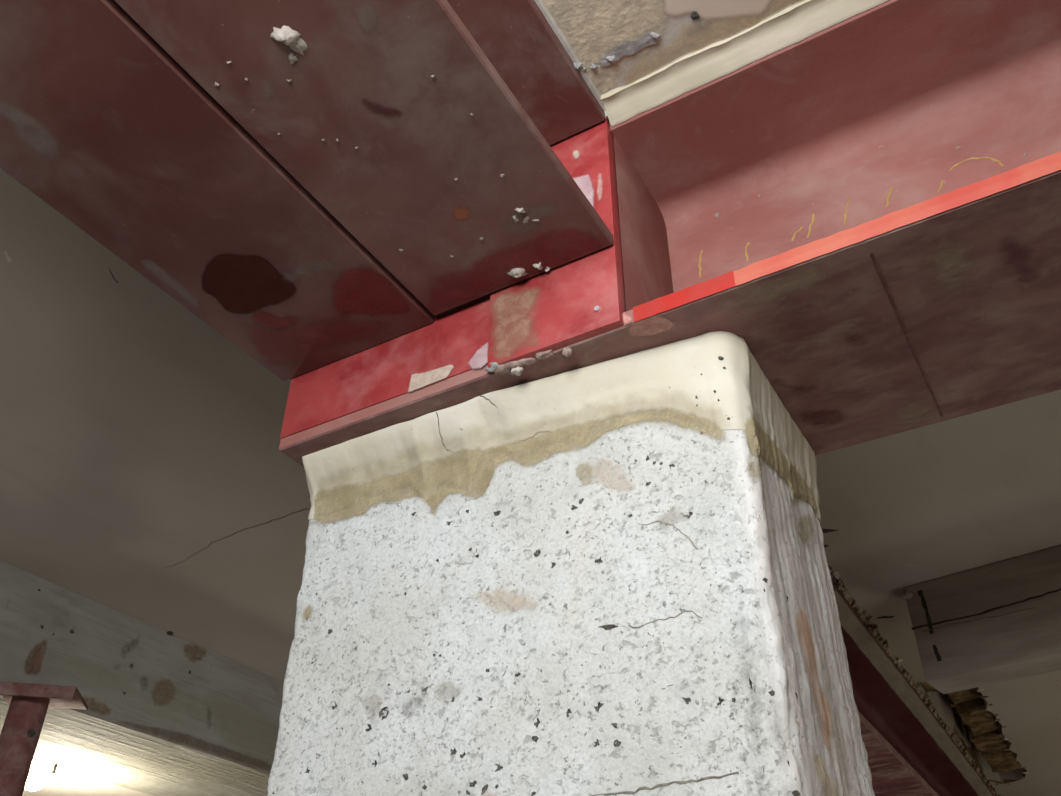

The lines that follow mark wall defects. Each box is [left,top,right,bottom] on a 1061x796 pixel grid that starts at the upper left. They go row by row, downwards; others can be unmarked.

water stain [202,254,296,314]
water stain [314,409,722,523]
crack [165,508,310,568]
crack [598,610,702,630]
crack [911,588,1061,662]
spalling [828,565,1027,796]
crack [591,771,739,796]